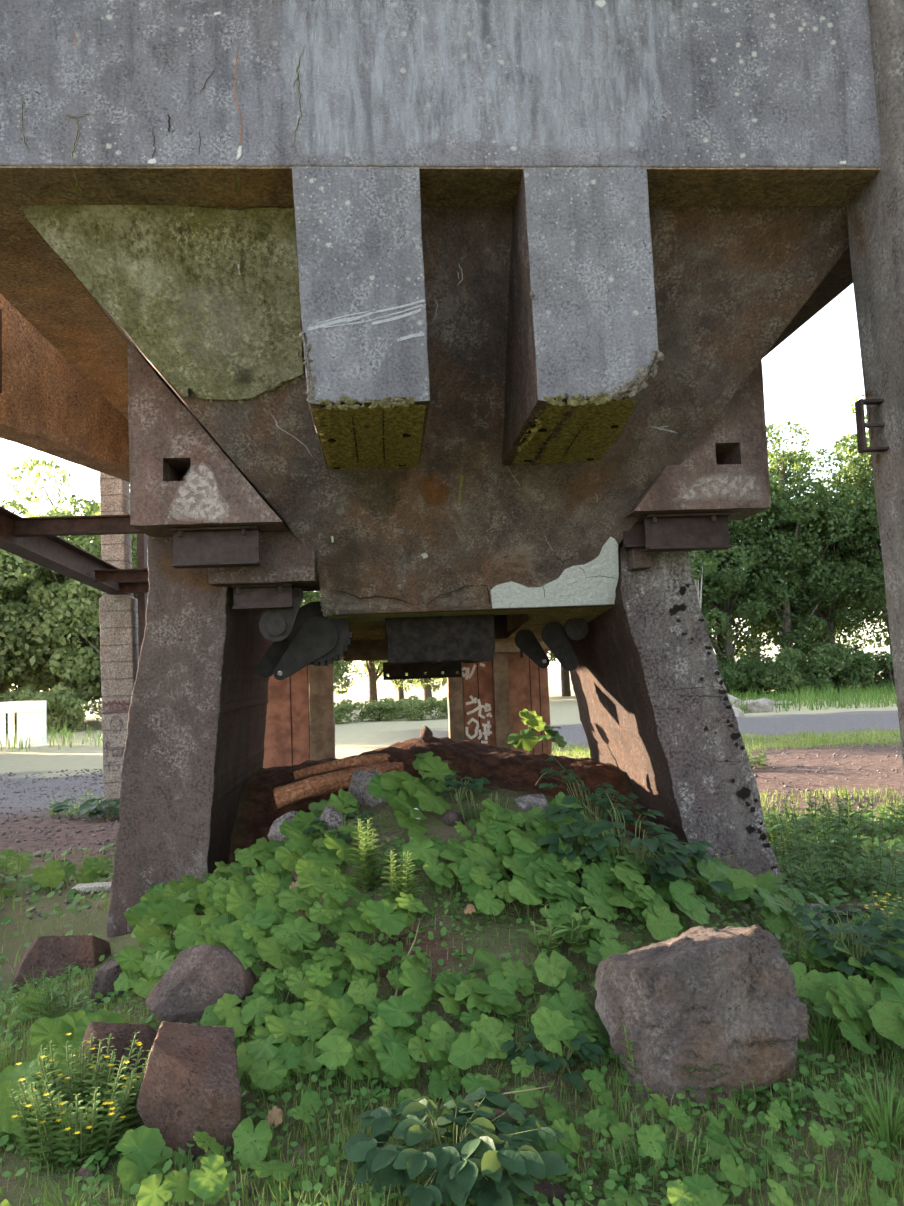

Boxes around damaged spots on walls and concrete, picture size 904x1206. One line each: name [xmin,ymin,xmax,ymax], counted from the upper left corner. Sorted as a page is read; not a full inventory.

crack [21,97,29,152]
crack [200,47,243,201]
crack [293,47,305,155]